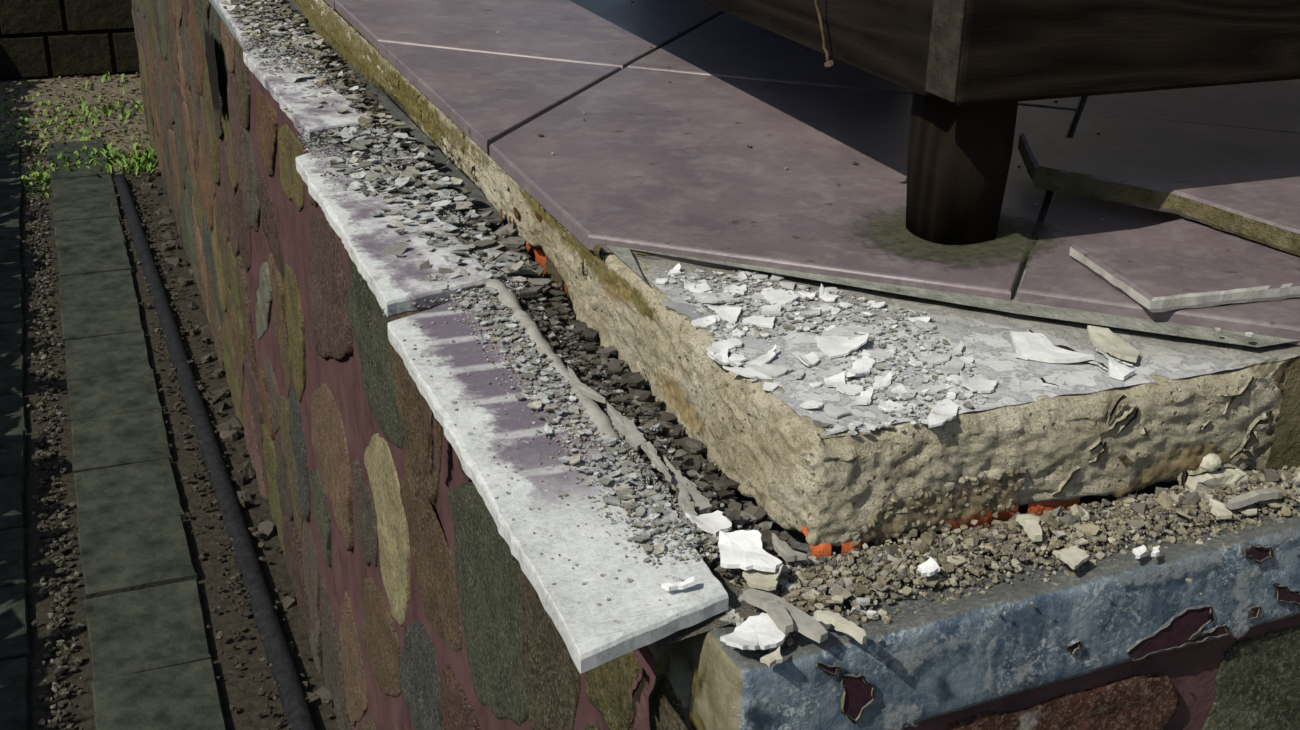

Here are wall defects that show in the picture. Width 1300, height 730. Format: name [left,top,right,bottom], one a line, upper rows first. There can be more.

peeling [656,263,998,436]
crack [1026,330,1148,496]
crack [1200,375,1273,462]
crack [1177,472,1186,492]
peeling [1132,545,1160,559]
peeling [1242,542,1274,564]
peeling [1126,604,1229,661]
peeling [1245,605,1261,620]
peeling [1273,582,1300,605]
peeling [816,661,877,725]